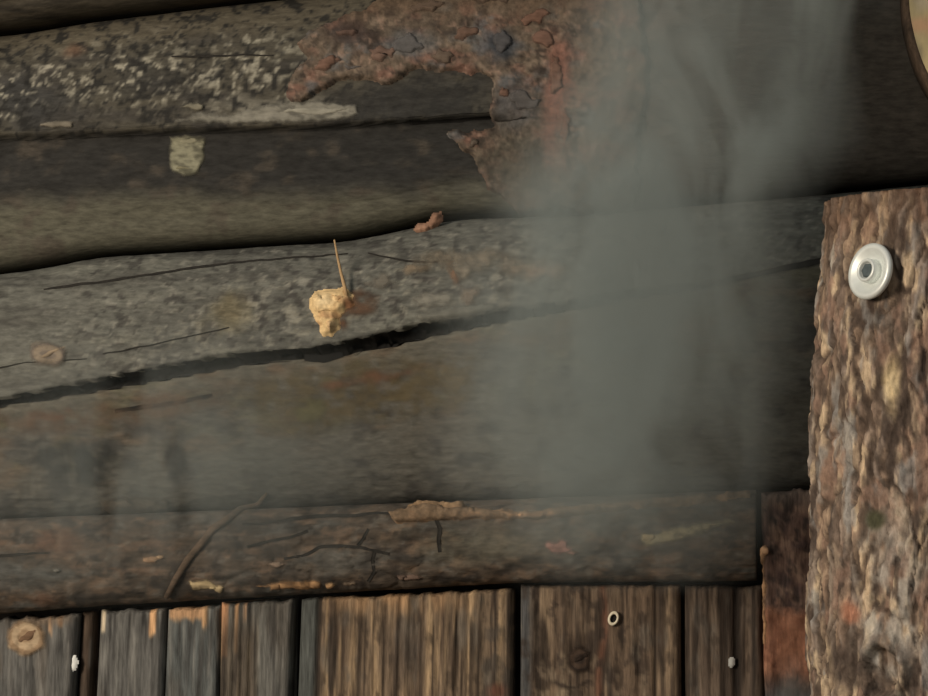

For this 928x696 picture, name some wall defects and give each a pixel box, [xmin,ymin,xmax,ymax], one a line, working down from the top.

spalling [170,136,204,174]
crack [44,252,453,290]
crack [0,258,821,413]
peeling [408,500,468,508]
crack [242,508,406,582]
crack [434,520,442,552]